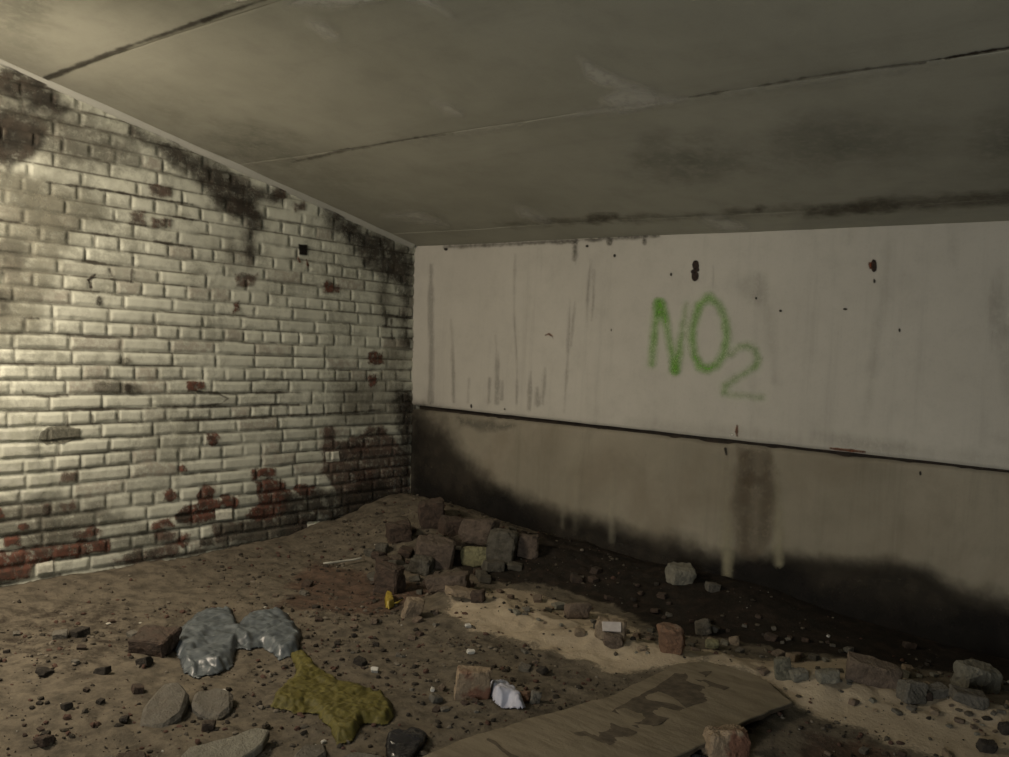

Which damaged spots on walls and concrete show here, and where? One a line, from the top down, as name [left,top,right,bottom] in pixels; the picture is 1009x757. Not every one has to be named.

crack [43,0,264,80]
crack [832,47,1009,74]
damp [0,69,128,332]
damp [131,128,276,259]
damp [329,213,413,345]
peeling [0,523,110,580]
peeling [207,433,219,446]
peeling [121,468,315,563]
peeling [322,426,410,512]
damp [218,391,1009,660]